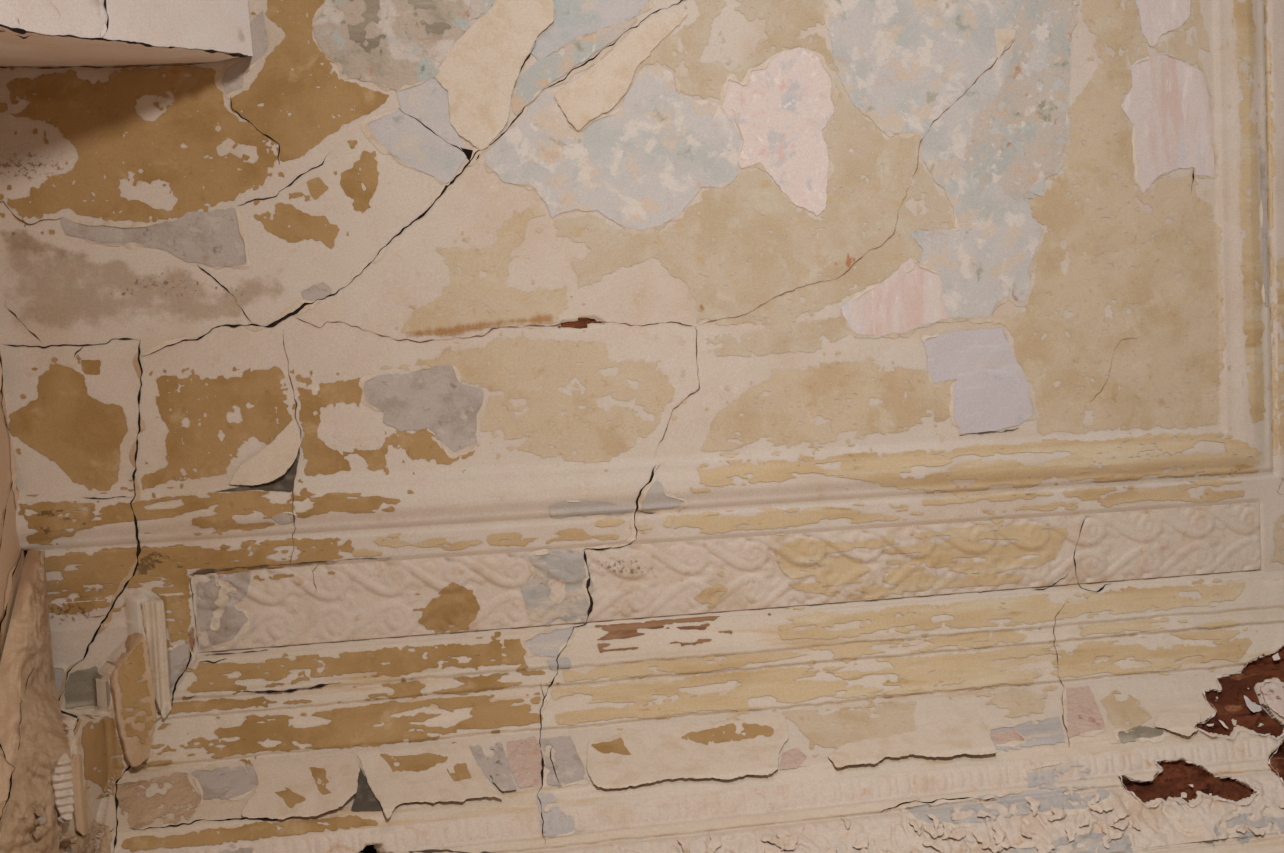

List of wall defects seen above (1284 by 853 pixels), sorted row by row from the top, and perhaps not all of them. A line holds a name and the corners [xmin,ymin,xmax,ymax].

crack [92,765,301,852]
crack [0,0,683,832]
crack [408,845,490,853]
peeling [0,0,1262,511]
peeling [0,332,1284,853]
crack [537,40,1019,842]
crack [1034,517,1111,744]